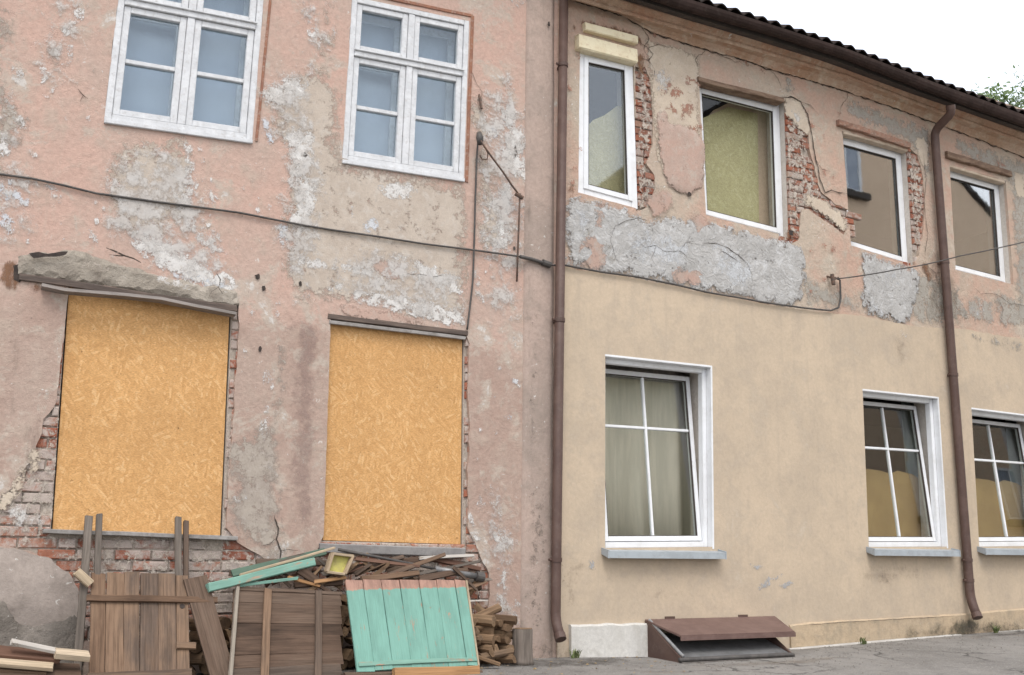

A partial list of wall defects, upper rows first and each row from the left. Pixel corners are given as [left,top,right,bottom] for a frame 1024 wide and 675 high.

flaking render [0,66,68,258]
flaking render [89,136,235,290]
flaking render [255,2,526,326]
peeling [628,231,702,285]
flaking render [634,33,705,208]
crack [570,0,1024,194]
spalling [778,77,862,243]
spalling [838,101,930,266]
spalling [0,305,286,675]
crack [267,516,298,559]